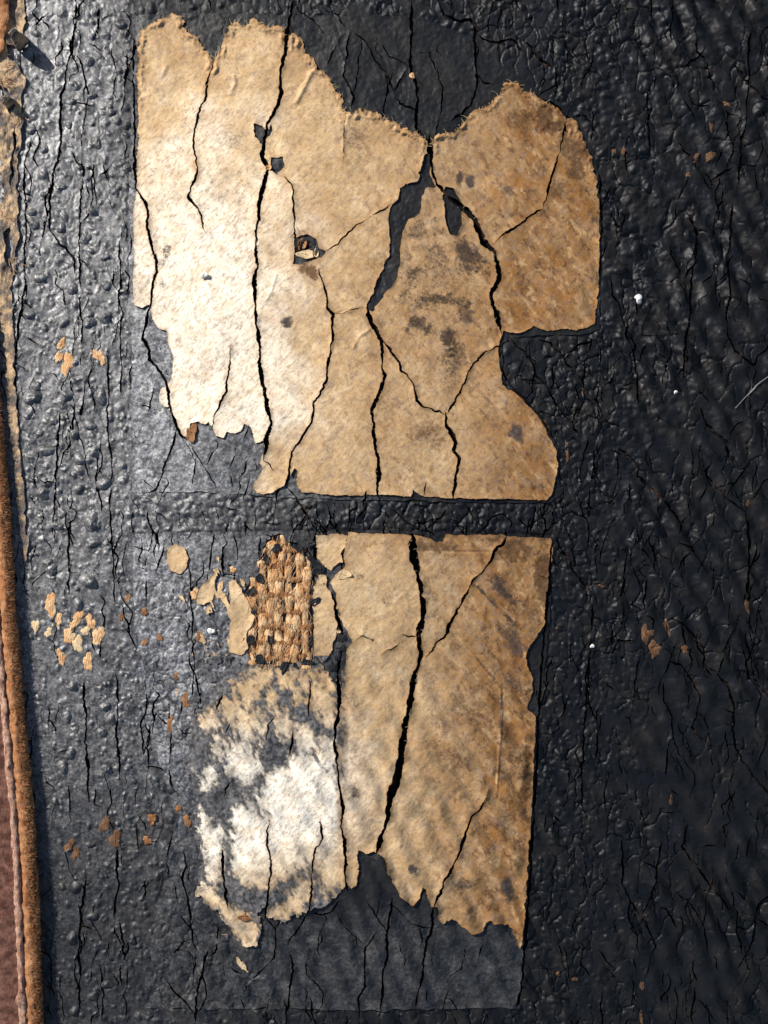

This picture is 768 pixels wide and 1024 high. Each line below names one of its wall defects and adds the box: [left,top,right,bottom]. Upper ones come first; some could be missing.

crack [597,175,605,244]
crack [679,31,768,382]
peeling [159,387,170,410]
peeling [186,422,197,443]
peeling [240,534,325,675]
crack [12,0,598,1021]
crack [625,316,649,404]
crack [618,448,706,613]
crack [662,473,768,794]
damp [180,656,345,942]
crack [516,543,640,1006]
crack [621,824,768,968]